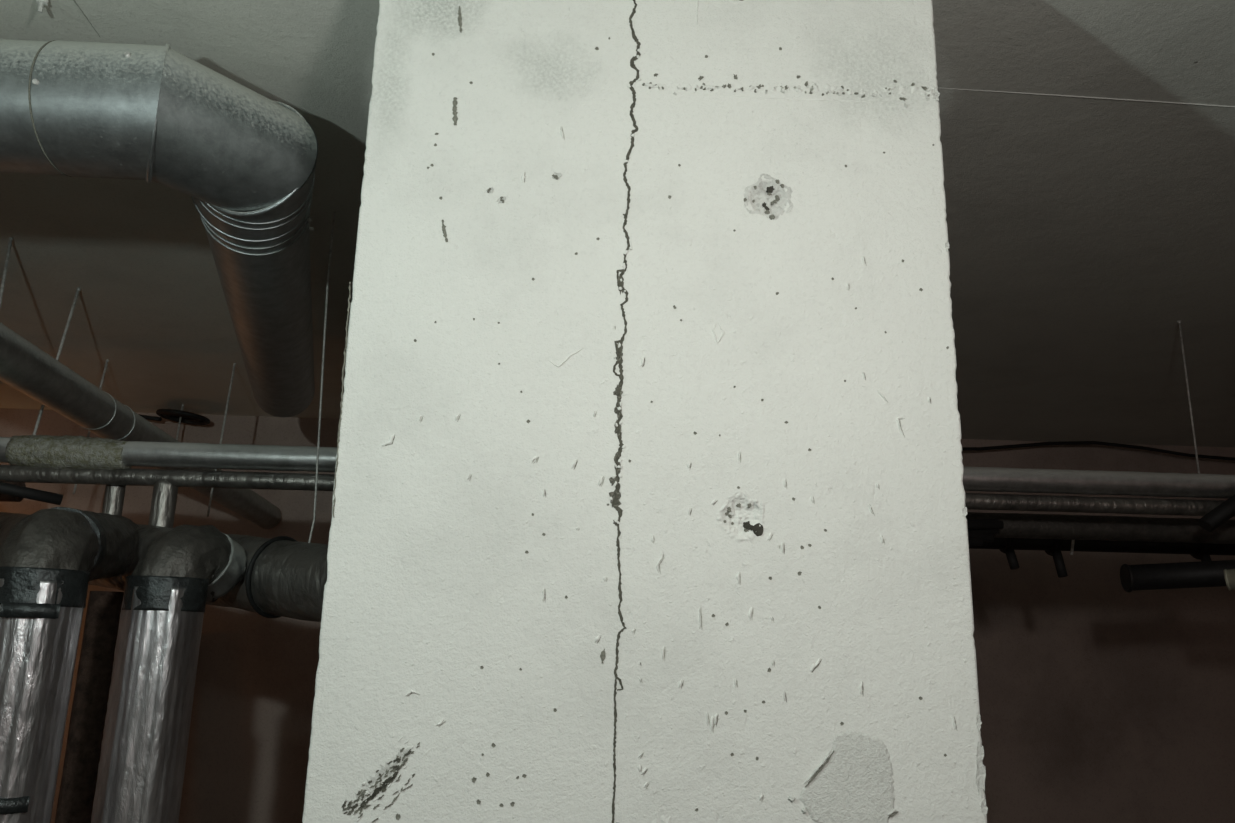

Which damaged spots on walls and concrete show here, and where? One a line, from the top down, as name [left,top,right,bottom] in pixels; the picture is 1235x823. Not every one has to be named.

spalling [744,174,794,220]
crack [609,0,641,823]
spalling [715,492,766,543]
spalling [342,737,420,822]